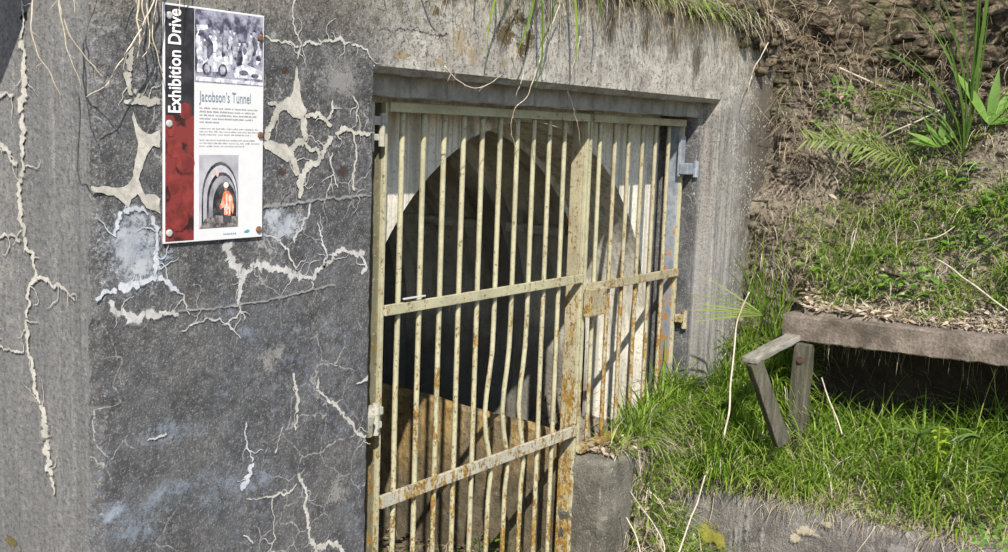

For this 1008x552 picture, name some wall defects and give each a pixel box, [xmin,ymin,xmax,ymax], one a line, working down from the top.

spalling [91,46,162,213]
spalling [263,62,374,199]
crack [0,0,371,495]
crack [237,373,371,552]